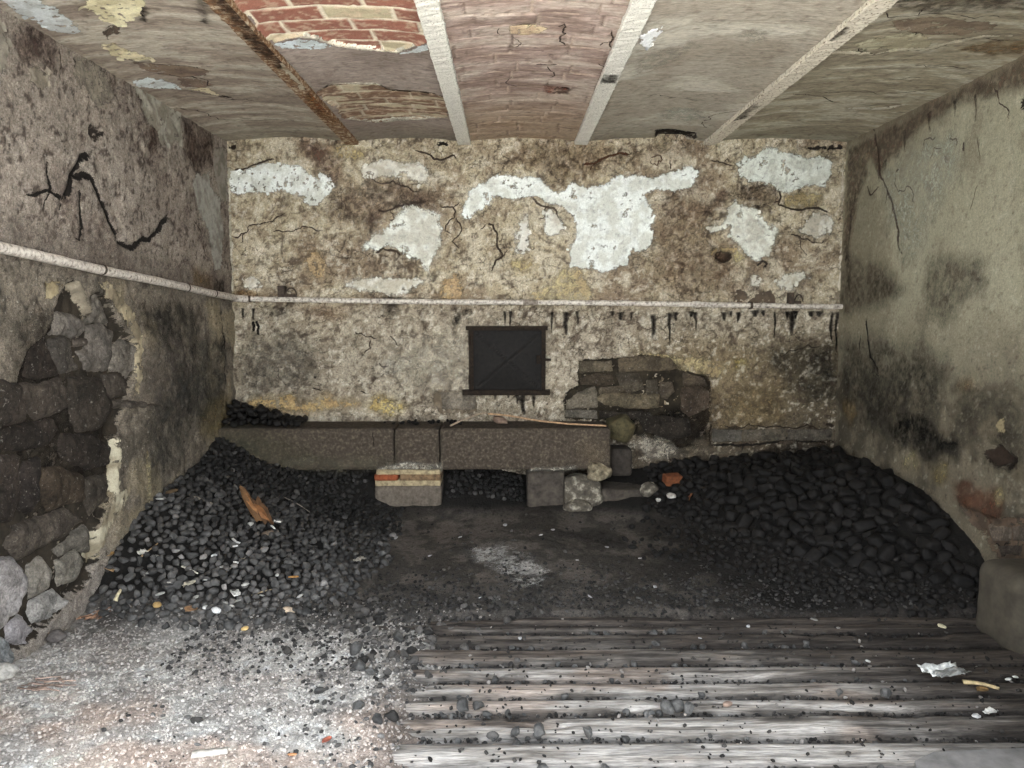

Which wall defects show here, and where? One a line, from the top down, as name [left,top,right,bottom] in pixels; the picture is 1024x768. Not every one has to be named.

flaking render [234,0,428,54]
crack [26,151,206,256]
peeling [193,147,335,291]
peeling [346,204,443,297]
crack [370,178,508,271]
peeling [462,165,699,273]
water stain [659,207,745,293]
crack [756,189,828,255]
water stain [721,61,1024,484]
crack [867,129,914,254]
flaking render [563,354,835,449]
flaking render [0,278,148,664]